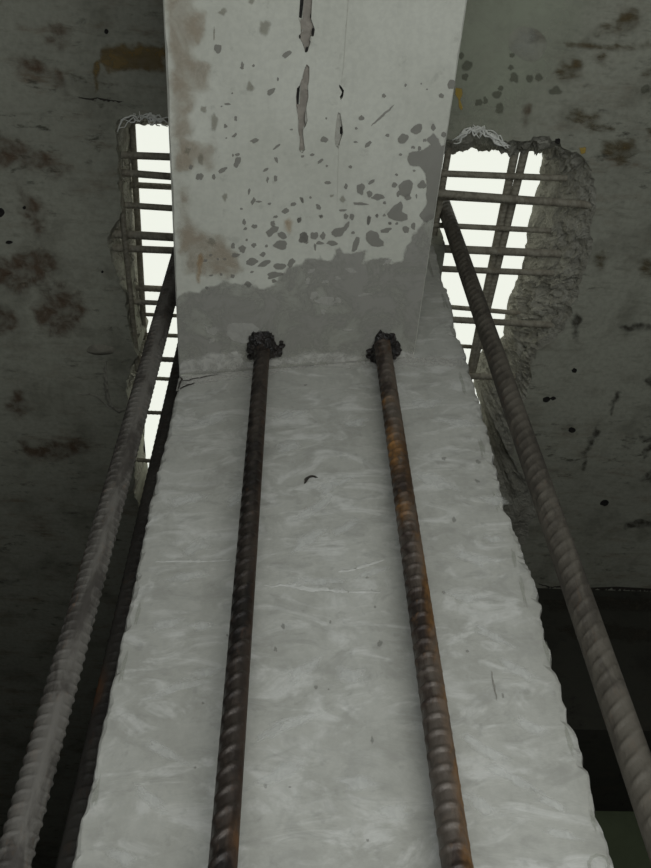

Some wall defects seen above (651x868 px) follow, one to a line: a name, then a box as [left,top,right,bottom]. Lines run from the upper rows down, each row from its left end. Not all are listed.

corrosion [93,44,166,88]
spalling [296,65,309,150]
spalling [299,0,315,52]
spalling [335,112,343,146]
spalling [0,115,179,868]
spalling [208,323,270,868]
spalling [374,339,474,868]
spalling [432,133,651,863]